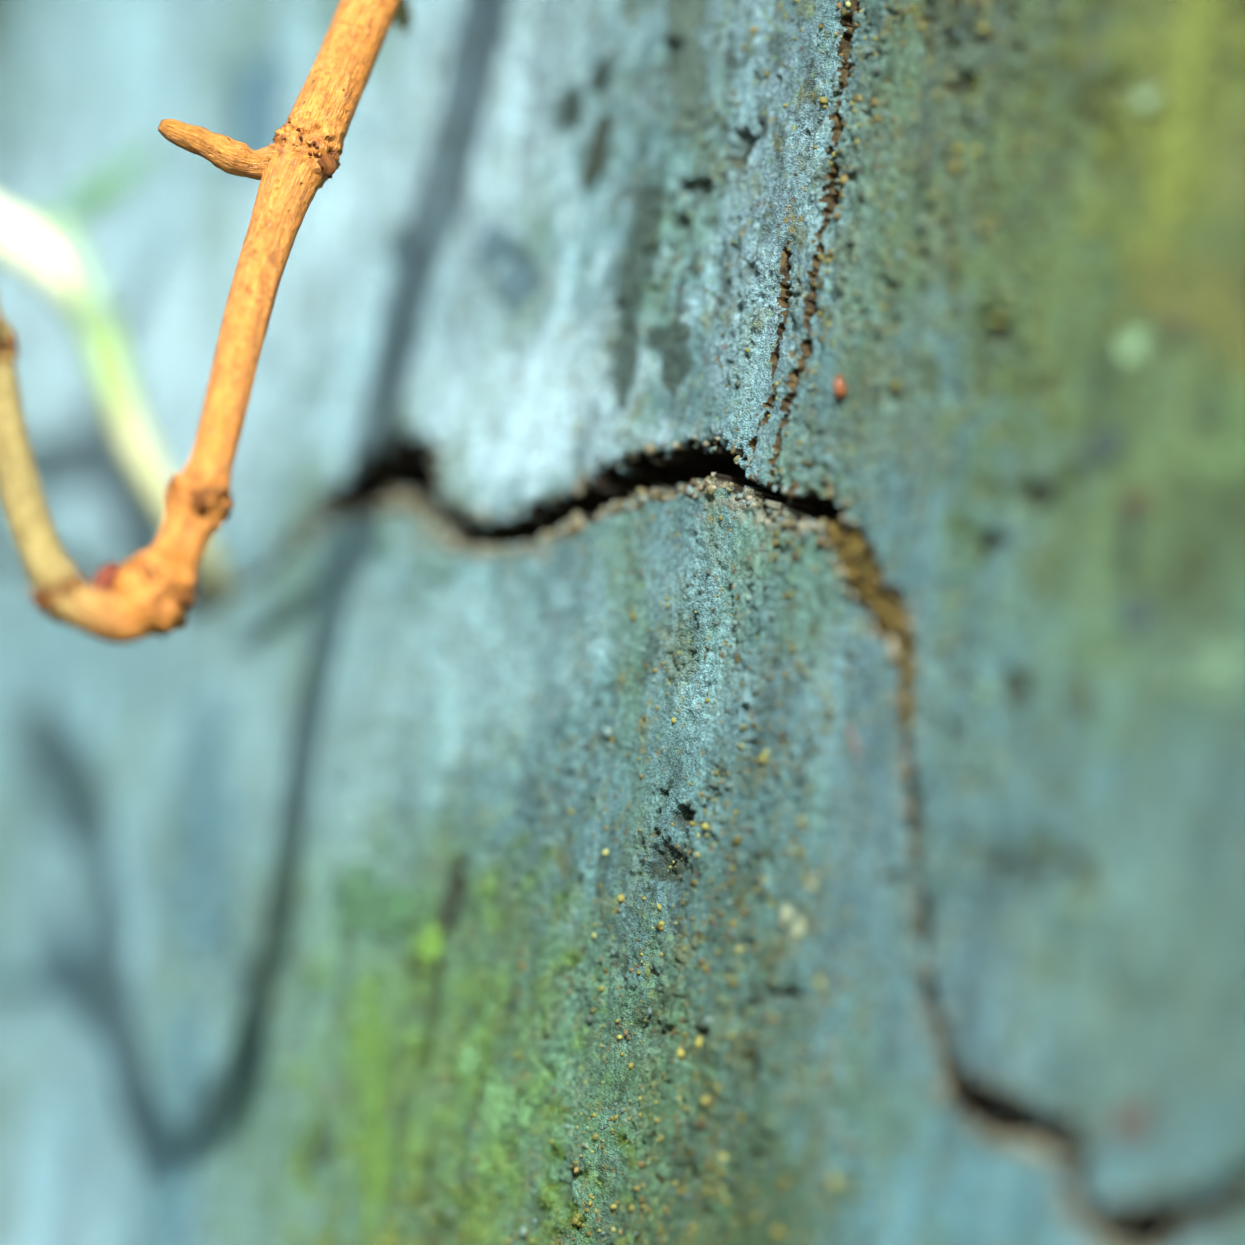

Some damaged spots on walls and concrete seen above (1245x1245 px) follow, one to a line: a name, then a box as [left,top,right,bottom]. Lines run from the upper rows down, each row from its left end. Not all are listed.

crack [836,0,861,93]
crack [235,98,1245,1245]